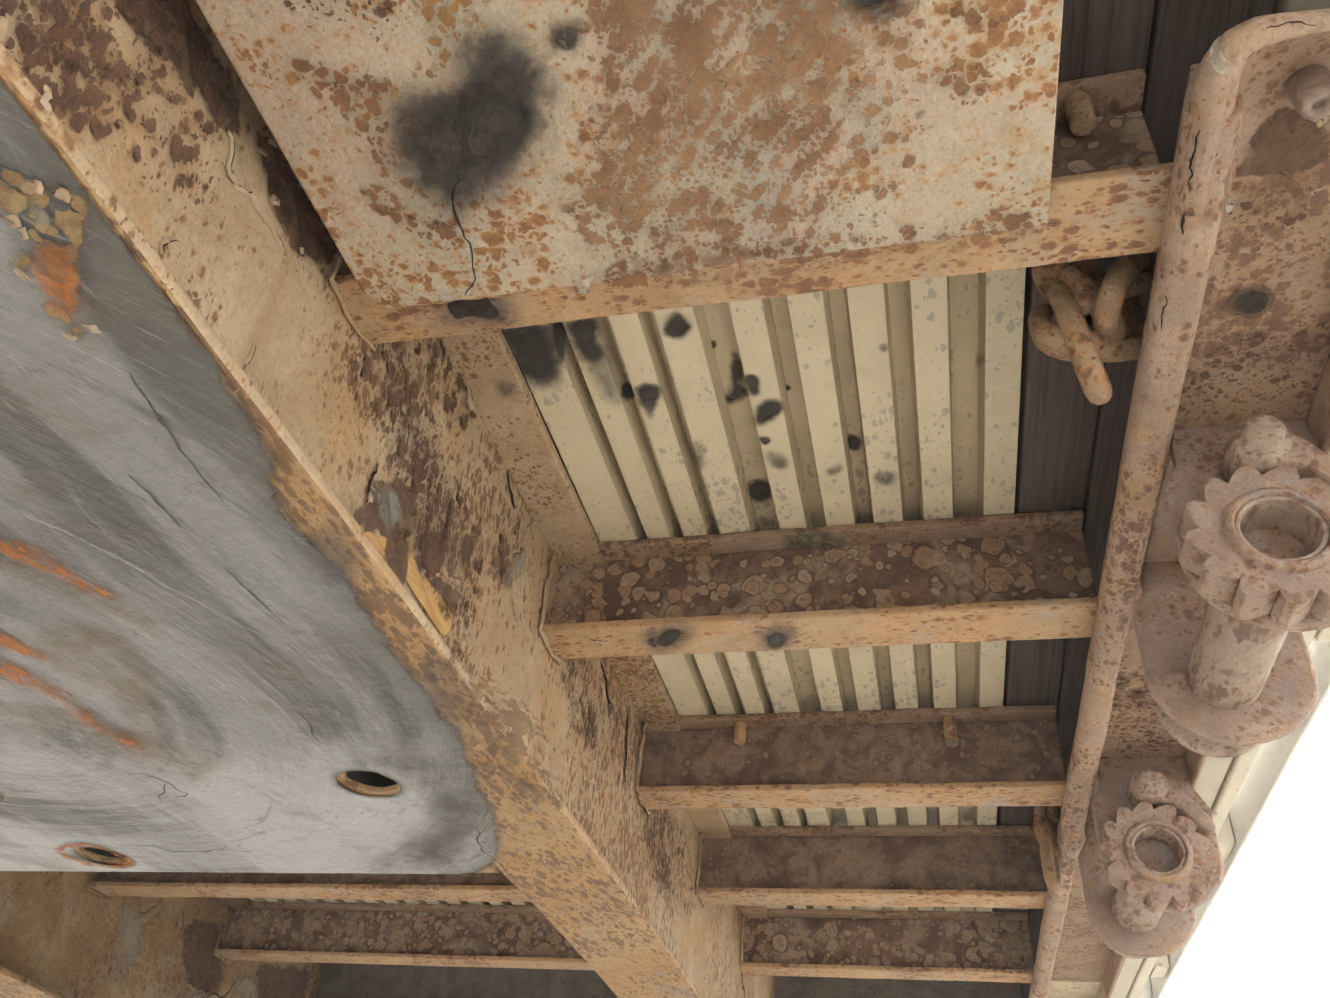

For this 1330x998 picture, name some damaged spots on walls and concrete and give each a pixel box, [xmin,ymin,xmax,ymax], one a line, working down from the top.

rust [283,0,492,79]
rust [292,60,402,166]
rust [568,0,1056,288]
rust [1229,108,1330,229]
rust [360,184,458,251]
rust [1179,321,1330,414]
rust [0,541,114,597]
rust [0,632,61,698]
rust [182,920,225,998]
rust [256,963,309,998]